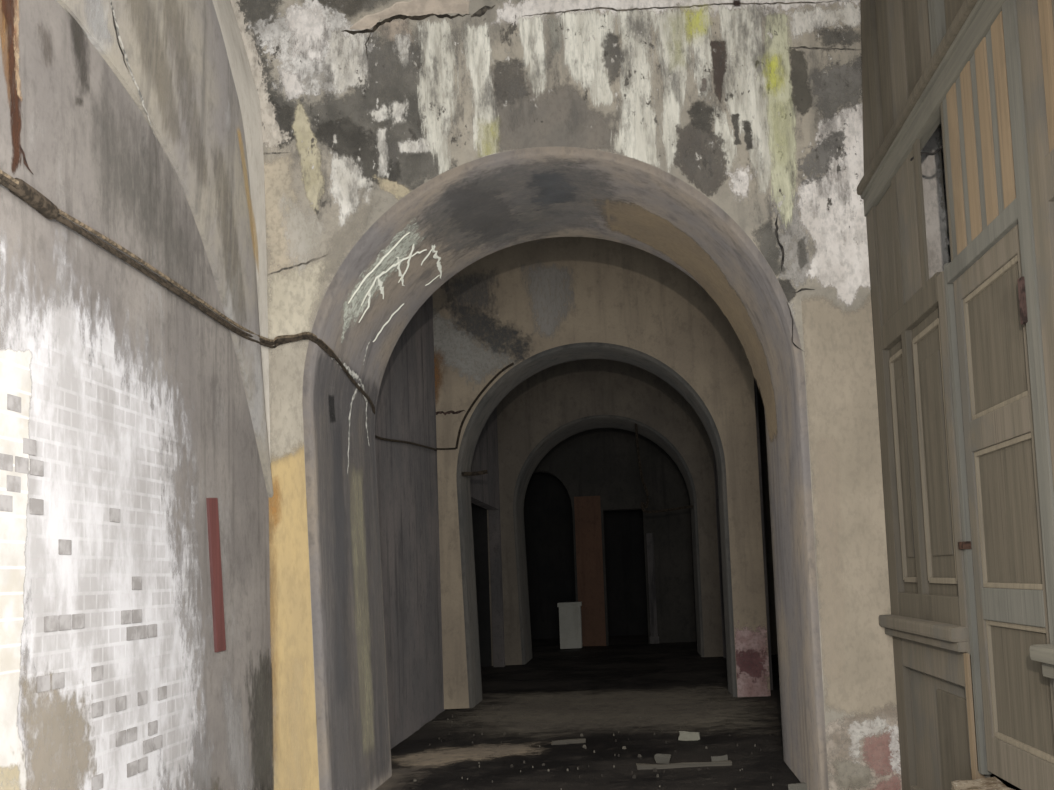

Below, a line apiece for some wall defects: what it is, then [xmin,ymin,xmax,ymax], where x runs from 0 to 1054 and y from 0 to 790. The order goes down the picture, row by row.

rust [0,0,33,174]
peeling [230,0,457,273]
damp [319,0,384,15]
crack [341,5,495,59]
peeling [473,12,661,150]
damp [417,0,861,228]
crack [522,0,852,17]
peeling [672,2,870,351]
crack [791,44,862,52]
peeling [921,127,950,279]
peeling [0,240,205,790]
damp [21,673,97,790]